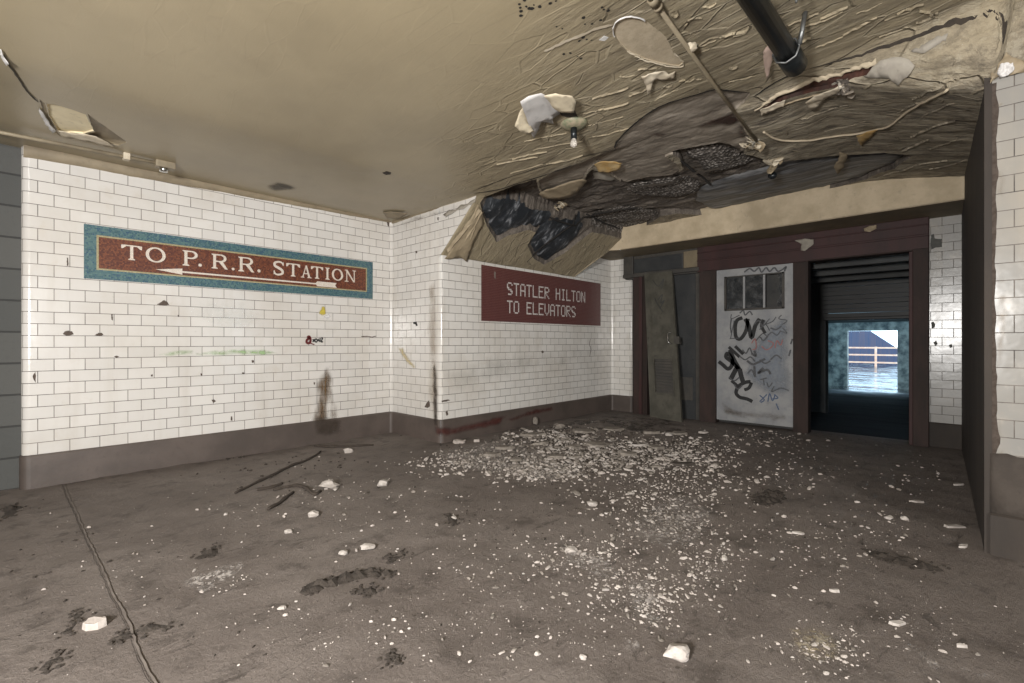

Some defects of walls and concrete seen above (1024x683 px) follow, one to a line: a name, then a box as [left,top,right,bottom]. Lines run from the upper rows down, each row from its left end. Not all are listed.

peeling [669,3,751,54]
peeling [788,3,938,49]
peeling [39,100,126,147]
spalling [437,16,978,264]
crack [62,485,151,683]